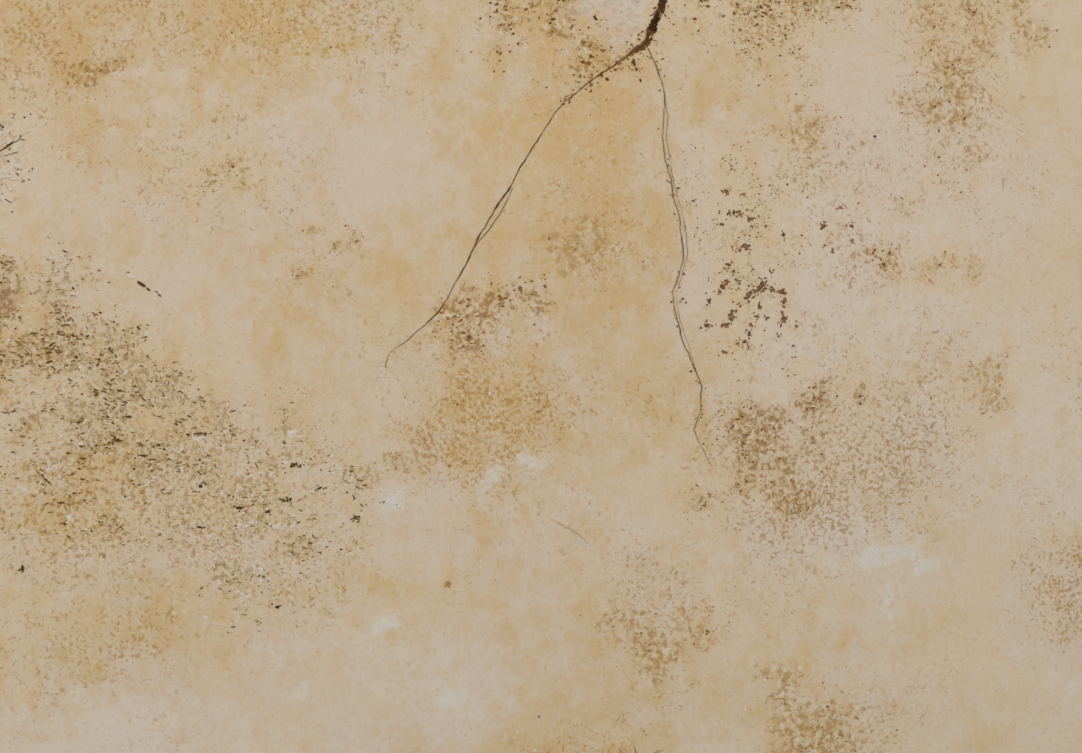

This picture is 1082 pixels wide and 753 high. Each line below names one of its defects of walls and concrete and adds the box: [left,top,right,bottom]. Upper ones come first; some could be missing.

crack [385,0,712,466]